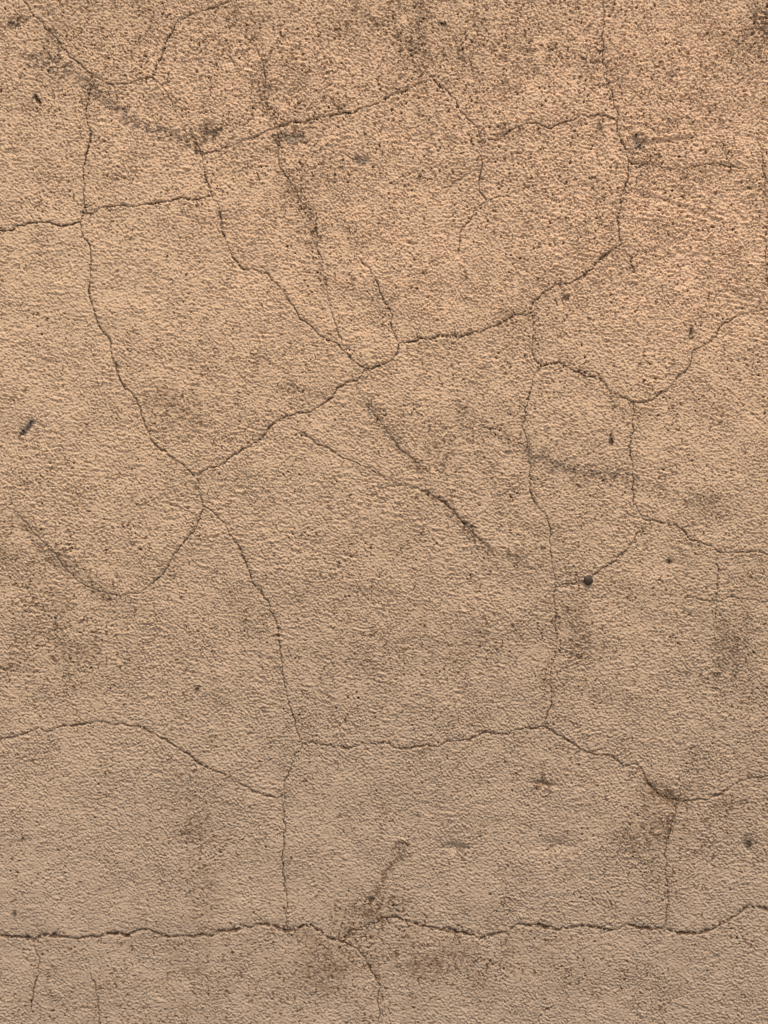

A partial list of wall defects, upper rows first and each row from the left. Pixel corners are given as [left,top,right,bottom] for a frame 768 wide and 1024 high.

crack [0,0,748,596]
crack [0,309,768,1022]